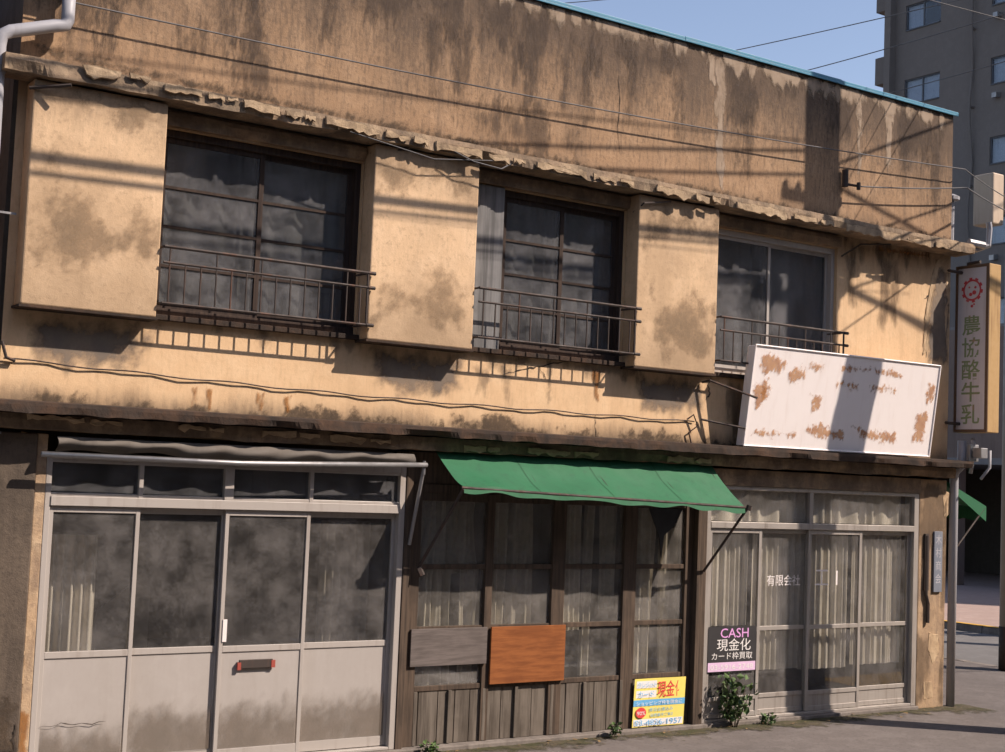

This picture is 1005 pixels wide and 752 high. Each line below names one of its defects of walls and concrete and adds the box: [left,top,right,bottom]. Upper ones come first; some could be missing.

leakage [500,0,688,57]
spalling [82,65,151,84]
leakage [181,79,335,116]
spalling [164,84,634,189]
leakage [677,48,944,203]
leakage [875,245,898,322]
leakage [34,322,148,367]
leakage [657,302,715,357]
leakage [375,352,462,394]
flaking render [261,431,391,445]
flaking render [464,445,500,454]
flaking render [528,448,599,459]